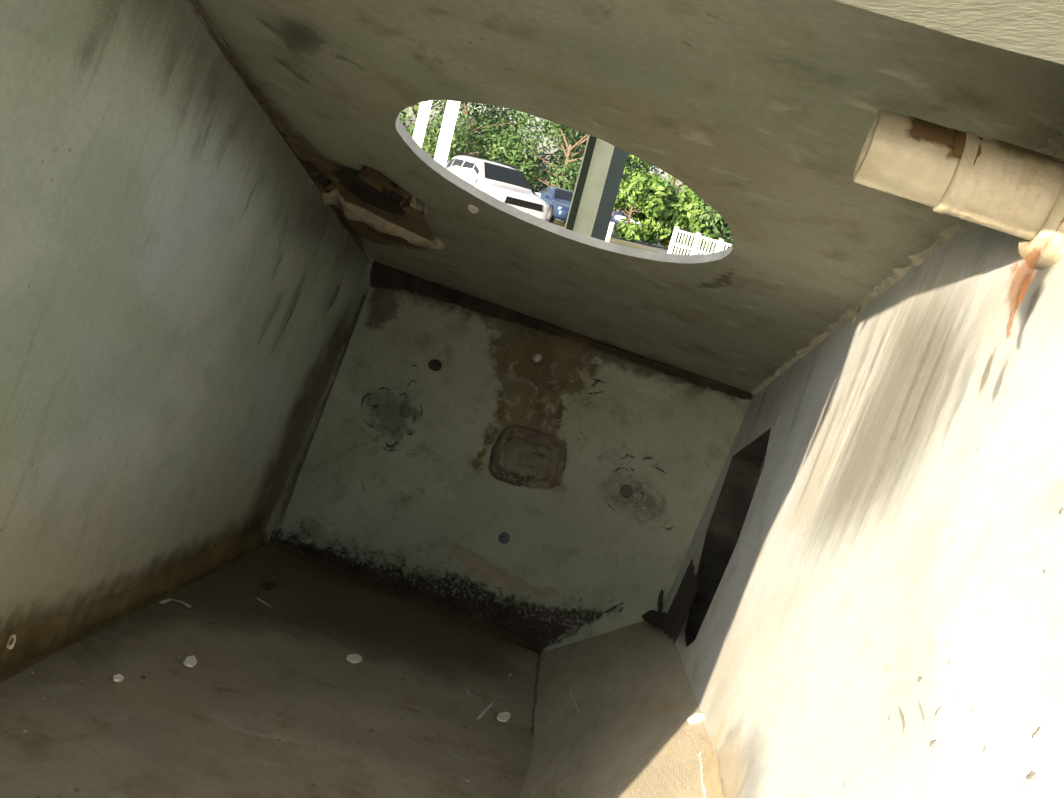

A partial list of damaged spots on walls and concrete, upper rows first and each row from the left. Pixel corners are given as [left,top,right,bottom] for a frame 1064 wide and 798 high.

spalling [304,161,446,251]
rust [1006,217,1064,338]
water stain [0,289,623,683]